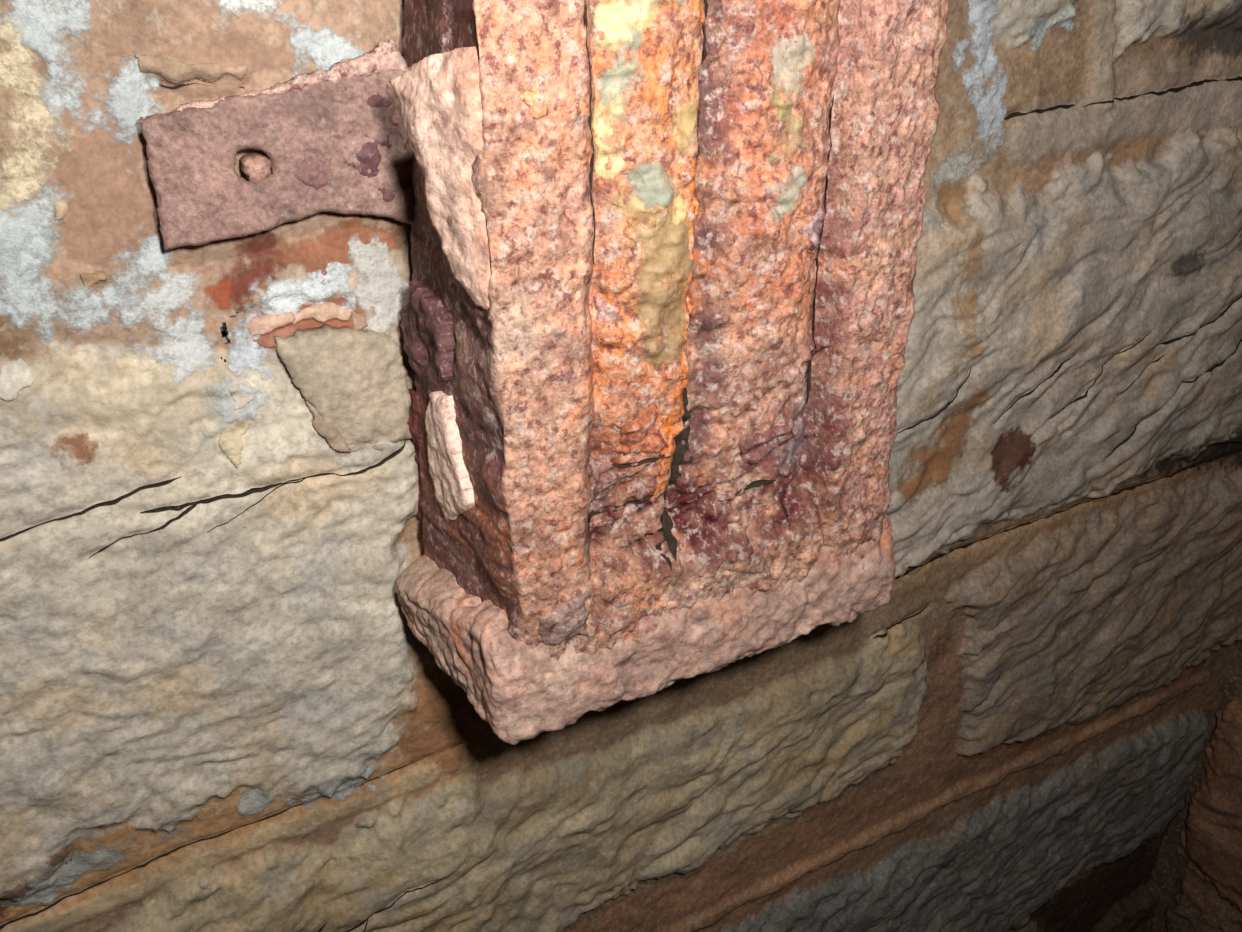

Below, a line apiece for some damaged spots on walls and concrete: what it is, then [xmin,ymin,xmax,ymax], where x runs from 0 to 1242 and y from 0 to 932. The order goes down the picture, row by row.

crack [701,0,709,63]
rust [138,96,225,124]
rust [240,39,410,203]
crack [694,96,702,160]
leakage [931,0,1077,195]
leakage [0,0,409,436]
spalling [246,293,368,348]
crack [0,439,406,558]
leakage [991,426,1036,491]
rust [395,673,464,773]